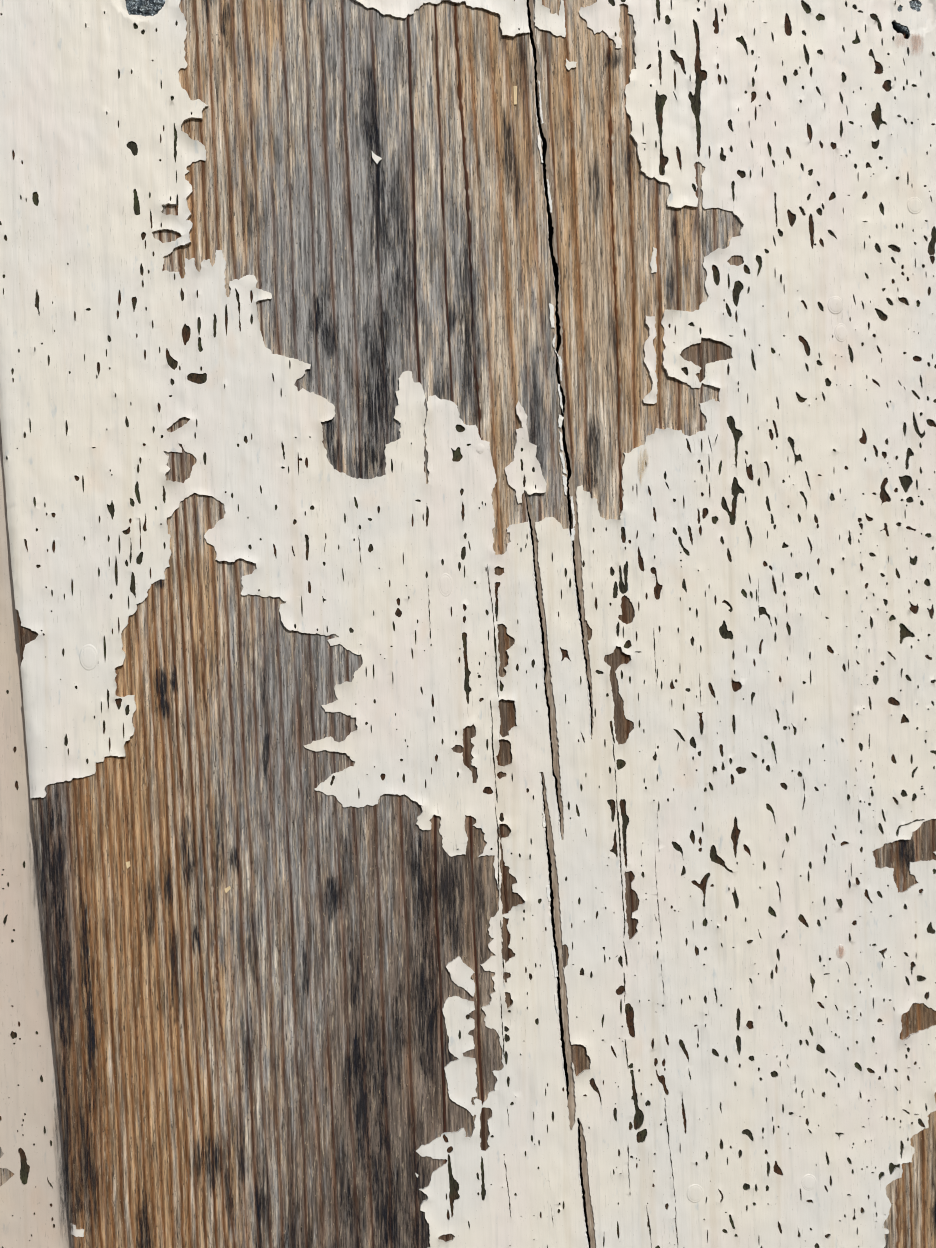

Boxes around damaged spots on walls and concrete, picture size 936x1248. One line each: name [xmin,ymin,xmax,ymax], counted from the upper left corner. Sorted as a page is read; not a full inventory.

peeling [152,0,769,748]
peeling [16,610,38,662]
crack [525,0,628,1248]
crack [623,602,701,699]
peeling [23,417,524,1248]
peeling [872,819,936,892]
crack [627,1098,708,1245]
peeling [879,1092,936,1248]